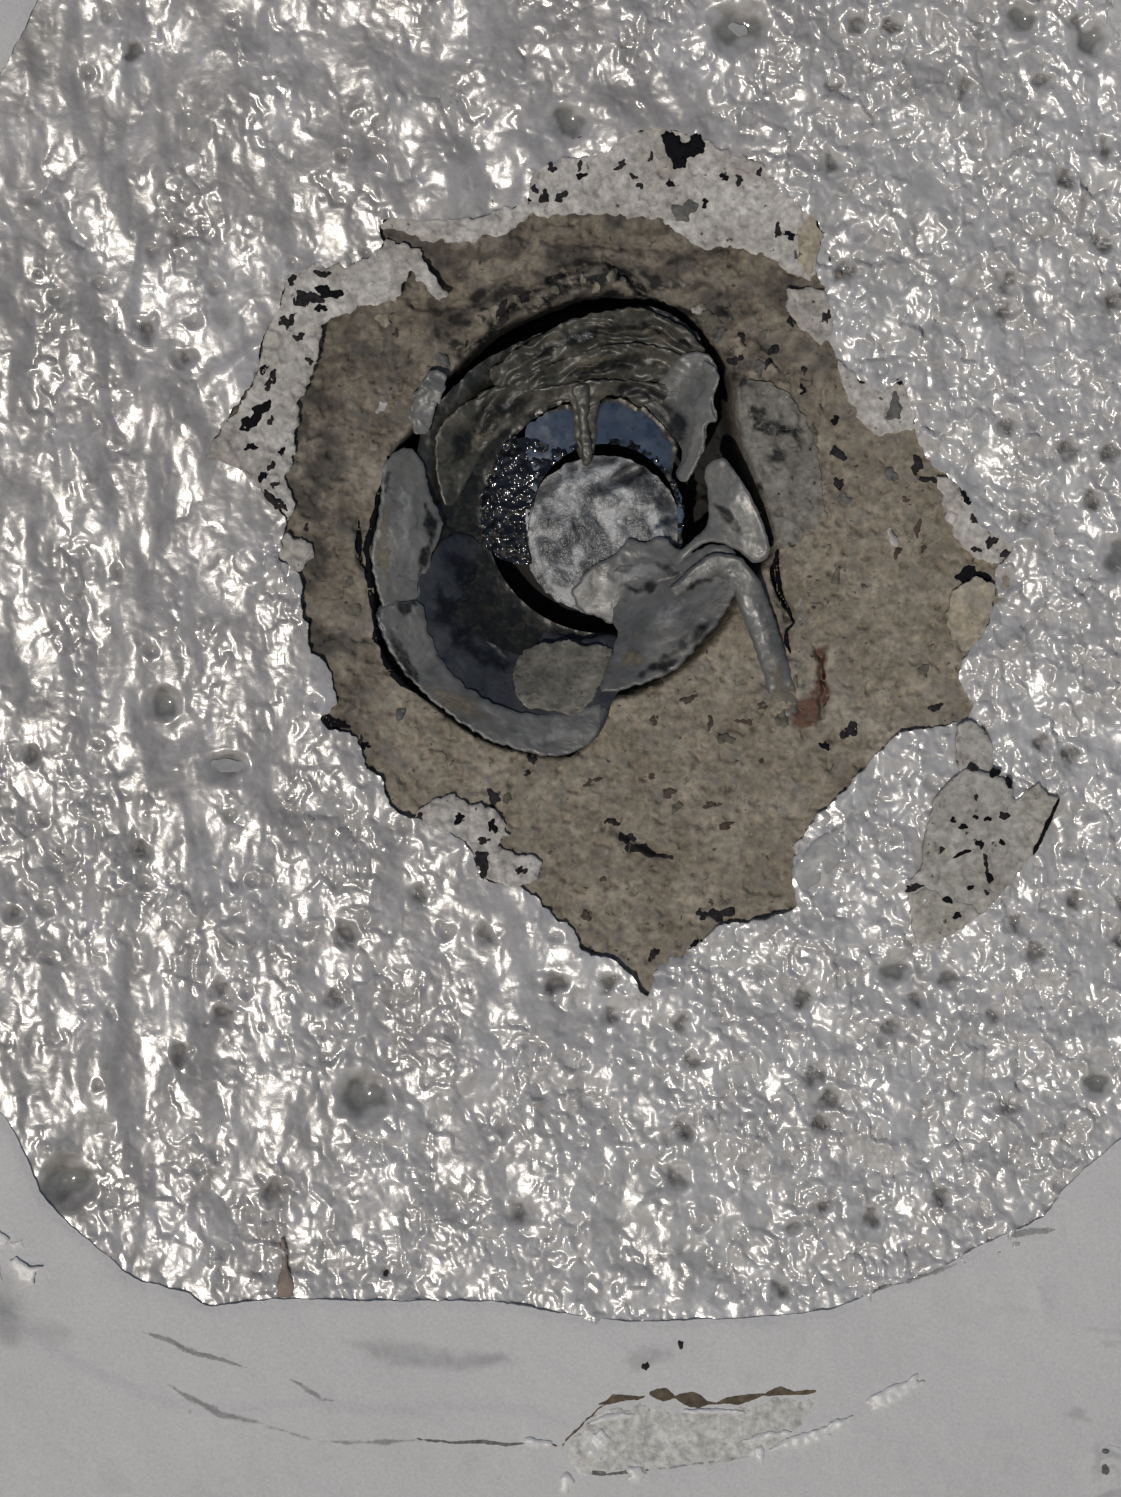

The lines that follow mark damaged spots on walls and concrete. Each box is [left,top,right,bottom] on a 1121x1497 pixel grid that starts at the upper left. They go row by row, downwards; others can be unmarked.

spalling [206,128,1011,994]
corrosion [792,647,830,728]
peeling [905,720,1060,946]
peeling [0,1232,43,1285]
crack [150,1334,240,1366]
crack [174,1388,294,1435]
crack [295,1382,320,1398]
crack [335,1386,816,1447]
peeling [559,1397,853,1495]
peeling [865,1373,925,1411]